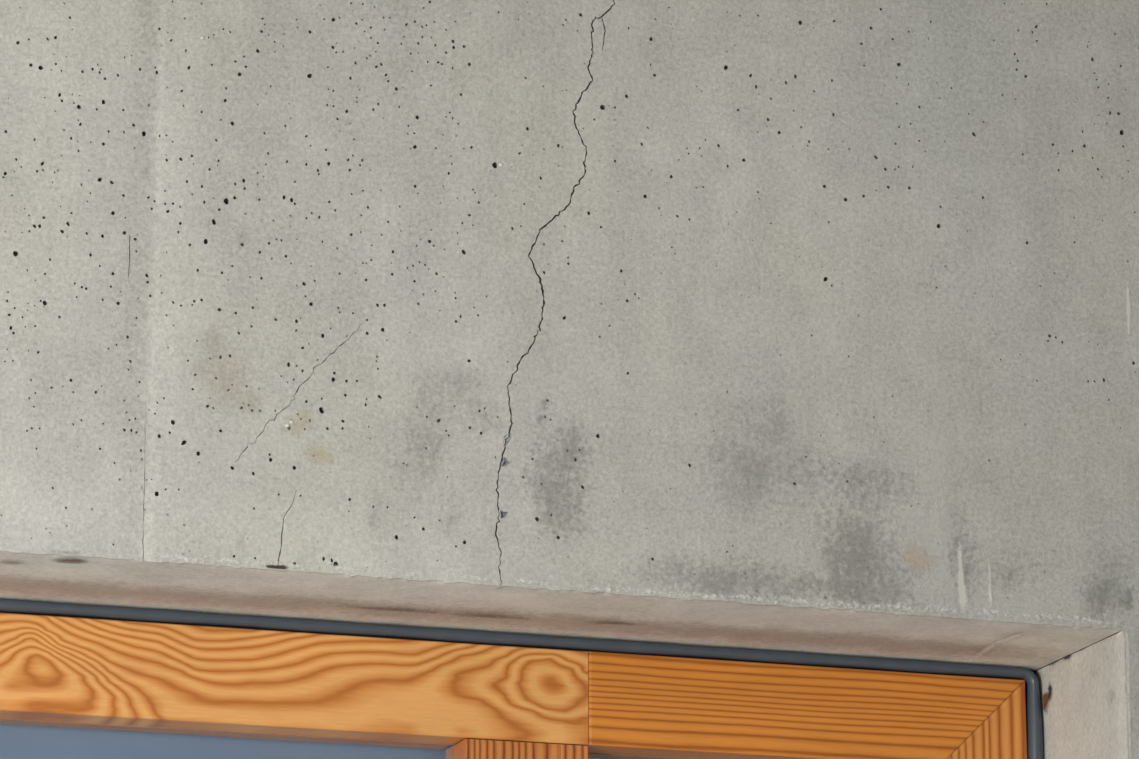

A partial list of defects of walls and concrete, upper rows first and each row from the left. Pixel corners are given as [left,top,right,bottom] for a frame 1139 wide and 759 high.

crack [495,0,615,589]
water stain [926,551,966,613]